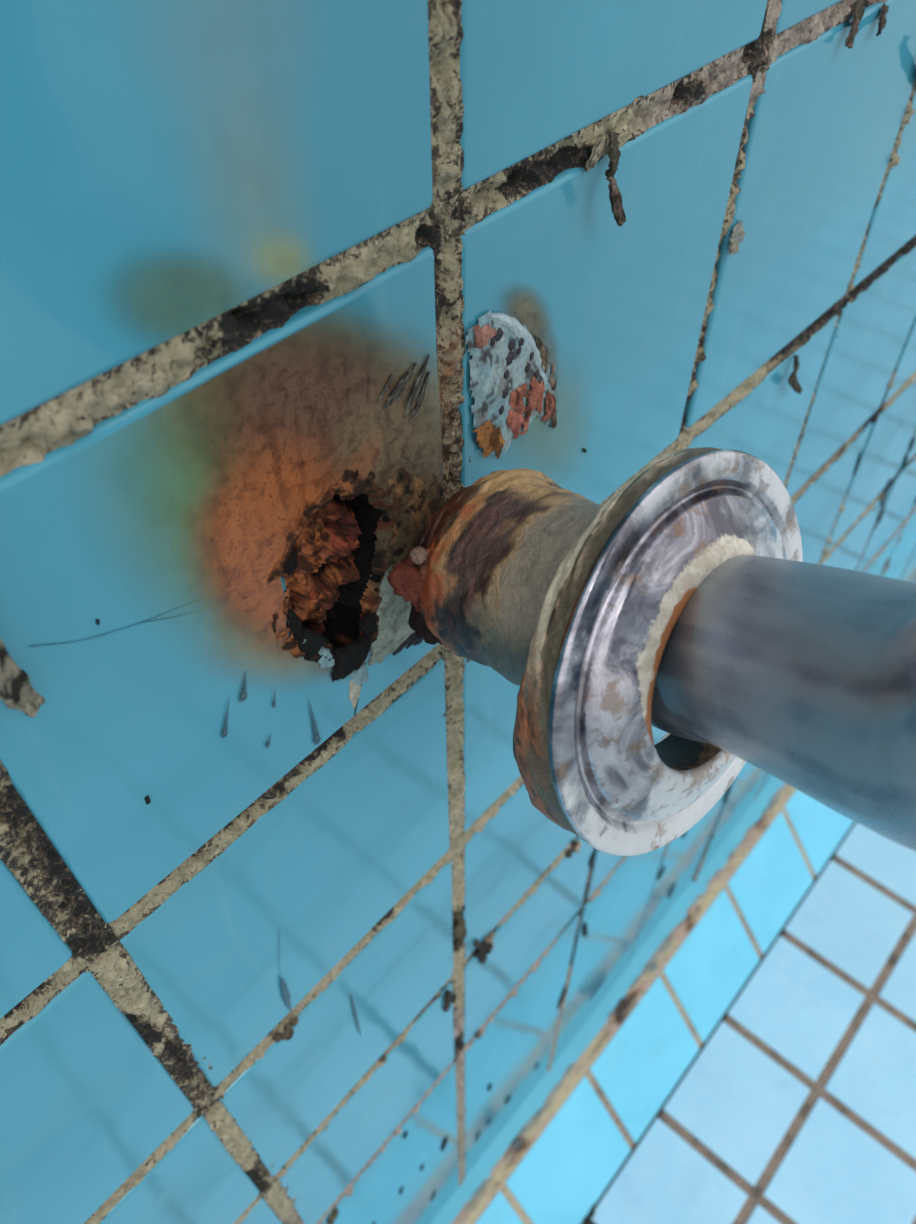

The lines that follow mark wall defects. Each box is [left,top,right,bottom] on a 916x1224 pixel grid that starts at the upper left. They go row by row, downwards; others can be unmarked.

spalling [465,310,557,459]
peeling [0,638,45,717]
rust [160,322,445,669]
spalling [284,490,424,685]